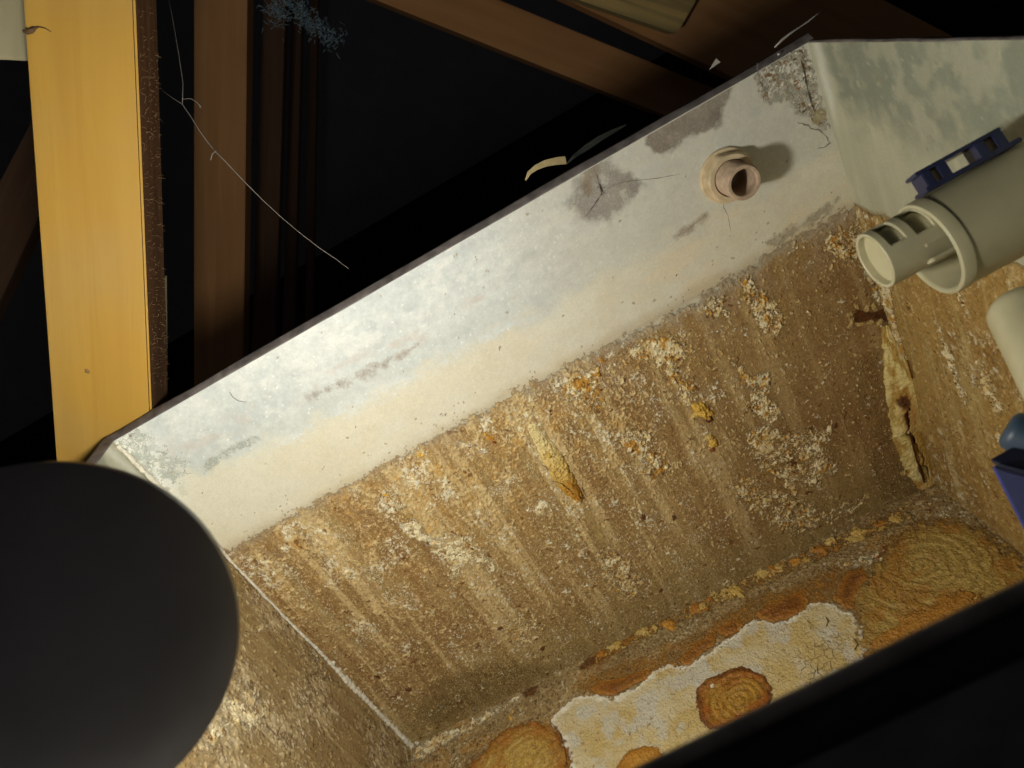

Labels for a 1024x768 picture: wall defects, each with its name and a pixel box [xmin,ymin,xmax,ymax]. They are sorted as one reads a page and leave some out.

crack [586,168,679,216]